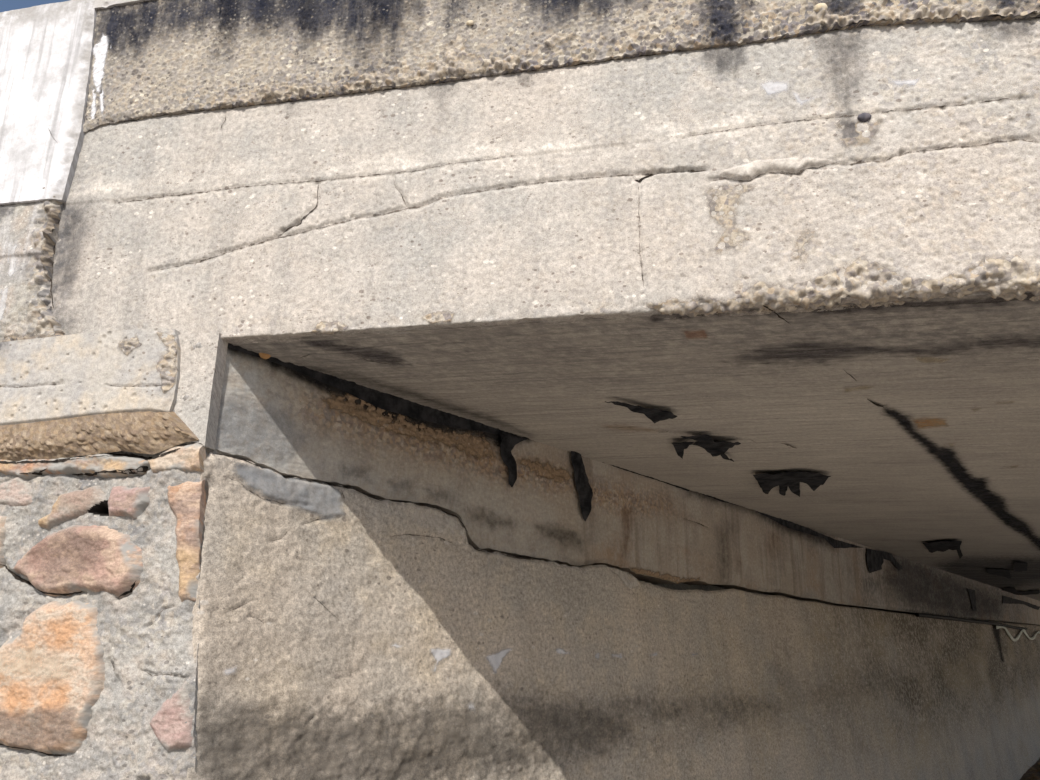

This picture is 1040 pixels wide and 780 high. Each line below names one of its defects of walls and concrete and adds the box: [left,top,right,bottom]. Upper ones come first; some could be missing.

water stain [99,0,403,49]
water stain [529,0,609,17]
water stain [705,0,743,70]
crack [692,98,1011,136]
crack [118,139,1033,270]
peeling [605,401,677,424]
crack [216,453,382,504]
spalling [323,393,593,521]
peeling [672,434,741,462]
peeling [753,472,831,497]
crack [869,400,1040,547]
water stain [197,697,626,780]